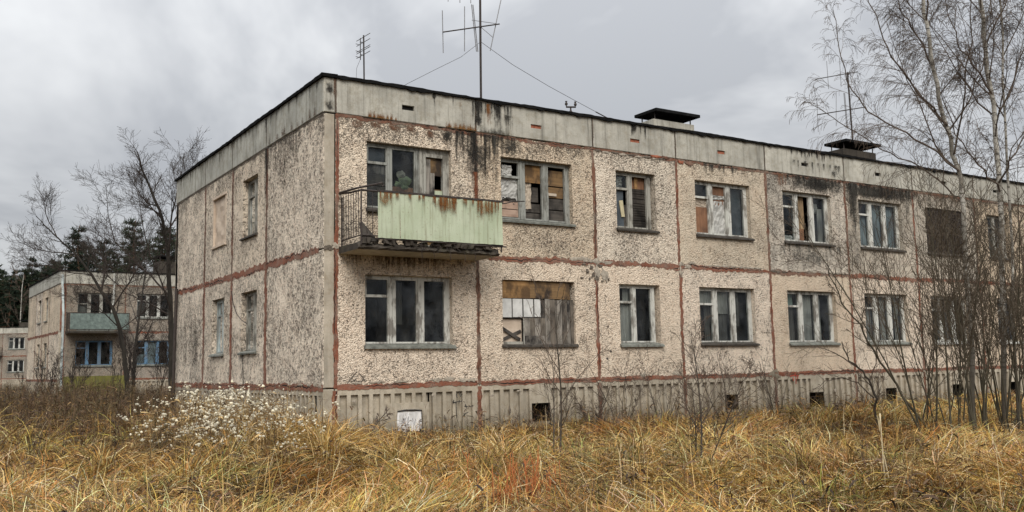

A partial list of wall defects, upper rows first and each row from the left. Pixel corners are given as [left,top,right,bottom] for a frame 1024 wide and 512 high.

water stain [443,101,519,180]
corrosion [380,172,499,215]
water stain [778,159,957,229]
spalling [569,257,612,283]